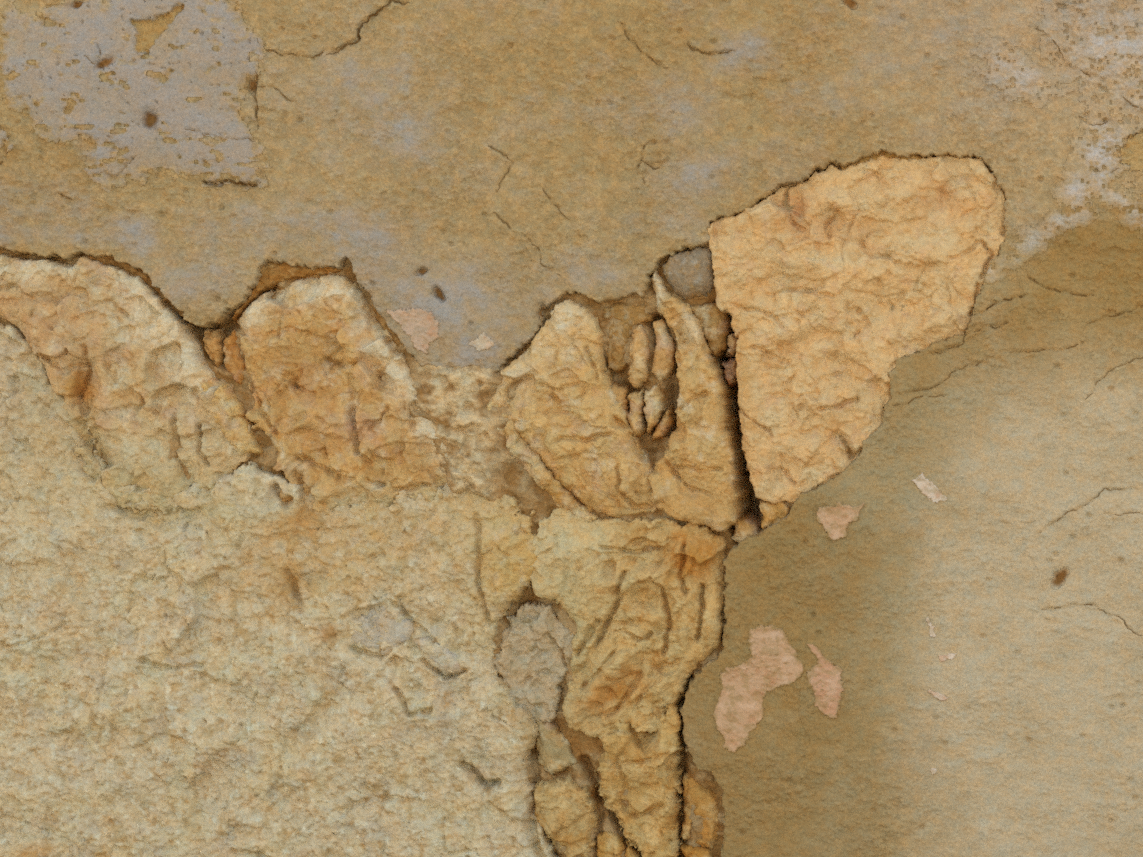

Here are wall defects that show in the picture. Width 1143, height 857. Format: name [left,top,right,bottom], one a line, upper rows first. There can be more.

spalling [839,152,922,170]
spalling [84,253,184,317]
spalling [232,262,342,323]
spalling [373,308,408,353]
peeling [806,643,845,719]